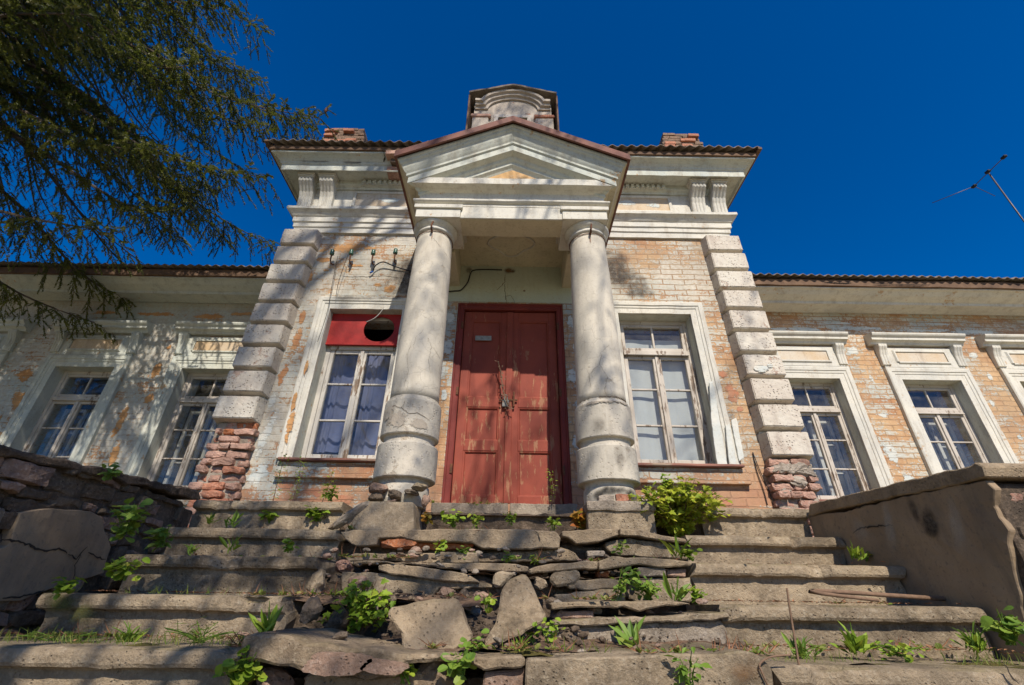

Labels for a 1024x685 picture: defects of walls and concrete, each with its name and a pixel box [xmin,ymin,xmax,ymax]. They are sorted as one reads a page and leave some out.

peeling [308,243,378,283]
peeling [0,367,33,418]
peeling [108,406,129,466]
peeling [246,310,370,530]
peeling [441,339,453,401]
crack [580,345,626,403]
peeling [880,442,914,481]
crack [1,539,105,579]